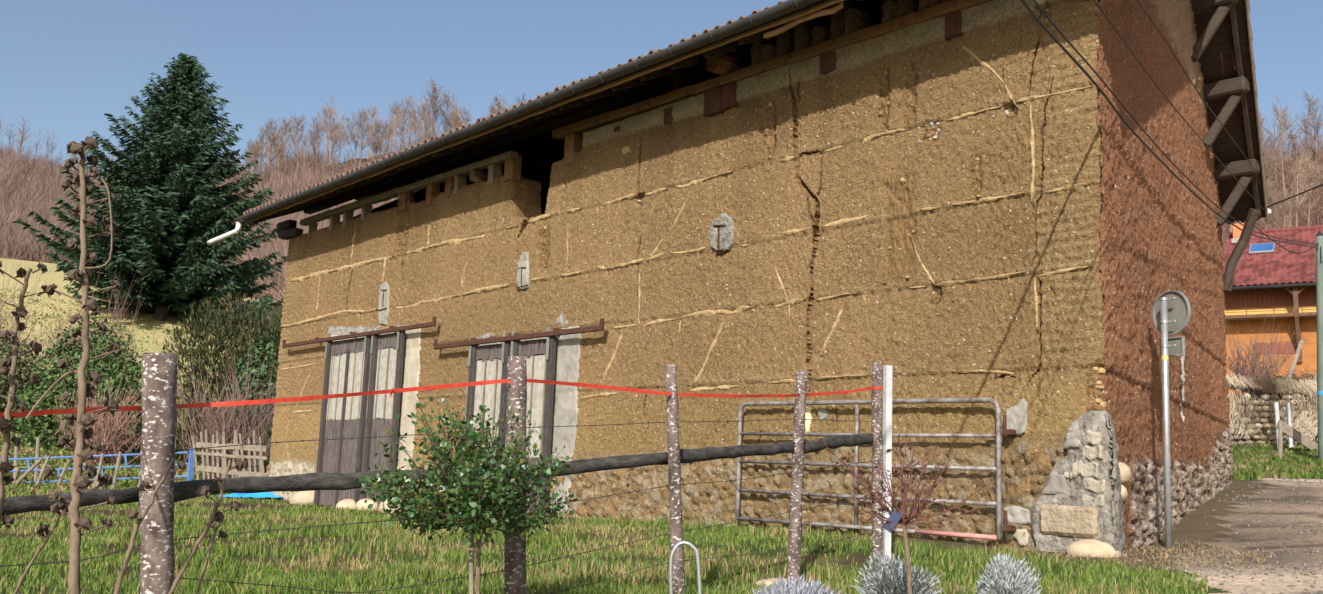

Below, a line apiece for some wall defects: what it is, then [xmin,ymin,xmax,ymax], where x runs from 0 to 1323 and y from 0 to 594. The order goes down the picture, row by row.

crack [788,70,838,428]
crack [996,34,1054,396]